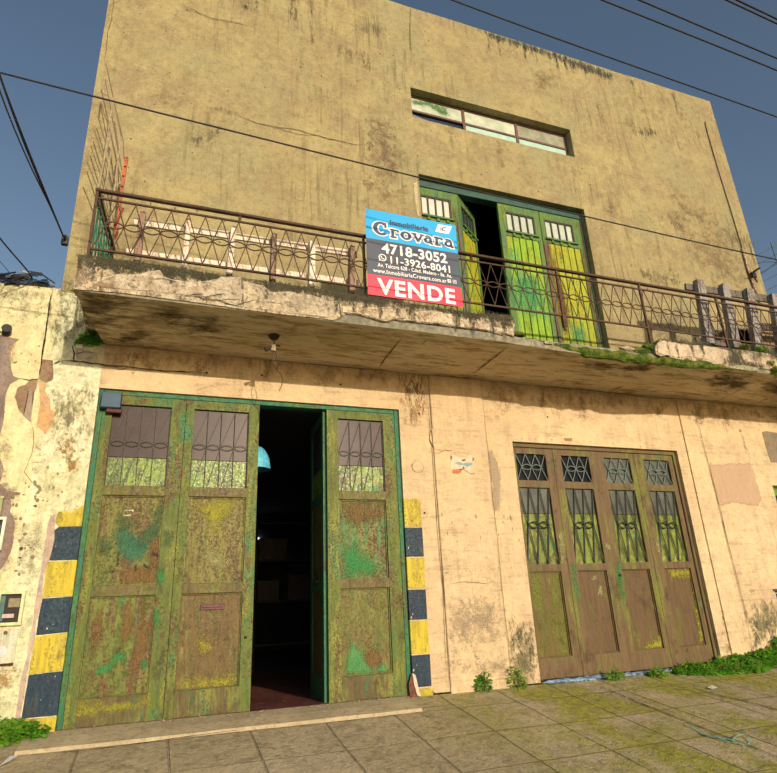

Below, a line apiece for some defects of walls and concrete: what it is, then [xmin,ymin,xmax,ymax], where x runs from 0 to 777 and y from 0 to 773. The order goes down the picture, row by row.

damp [486,31,612,80]
crack [239,115,365,146]
peeling [92,270,406,320]
flaking render [0,335,58,434]
crack [21,291,217,388]
crack [289,340,400,369]
peeling [416,310,512,334]
damp [584,361,650,373]
damp [708,351,767,394]
flaking render [0,459,63,724]